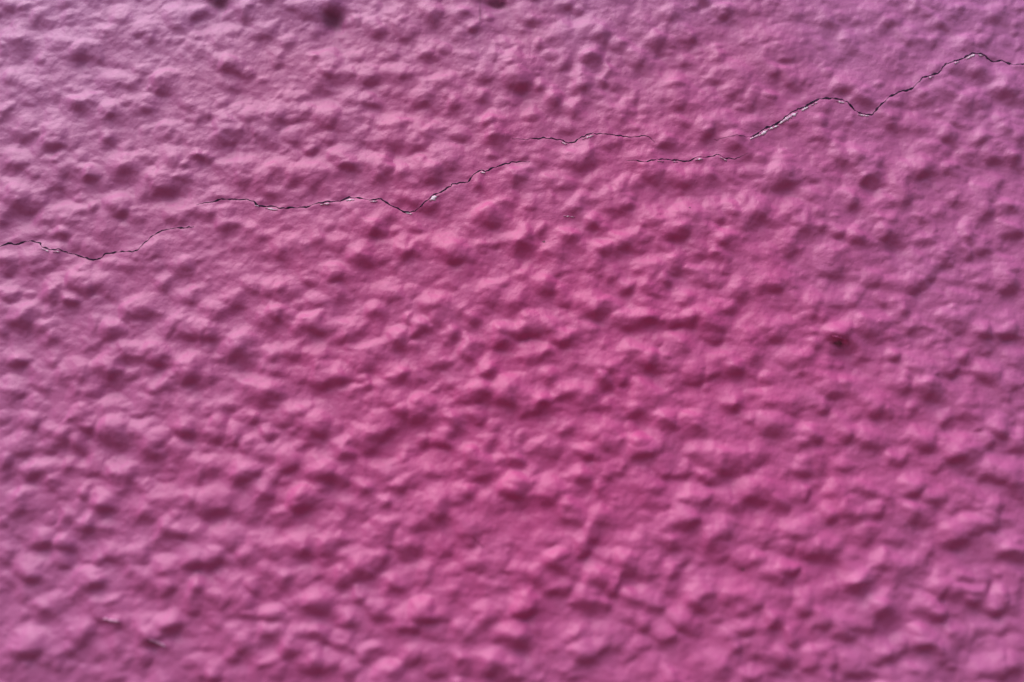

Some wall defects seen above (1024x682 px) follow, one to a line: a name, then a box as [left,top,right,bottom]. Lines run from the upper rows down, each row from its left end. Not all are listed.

crack [1,52,1024,261]